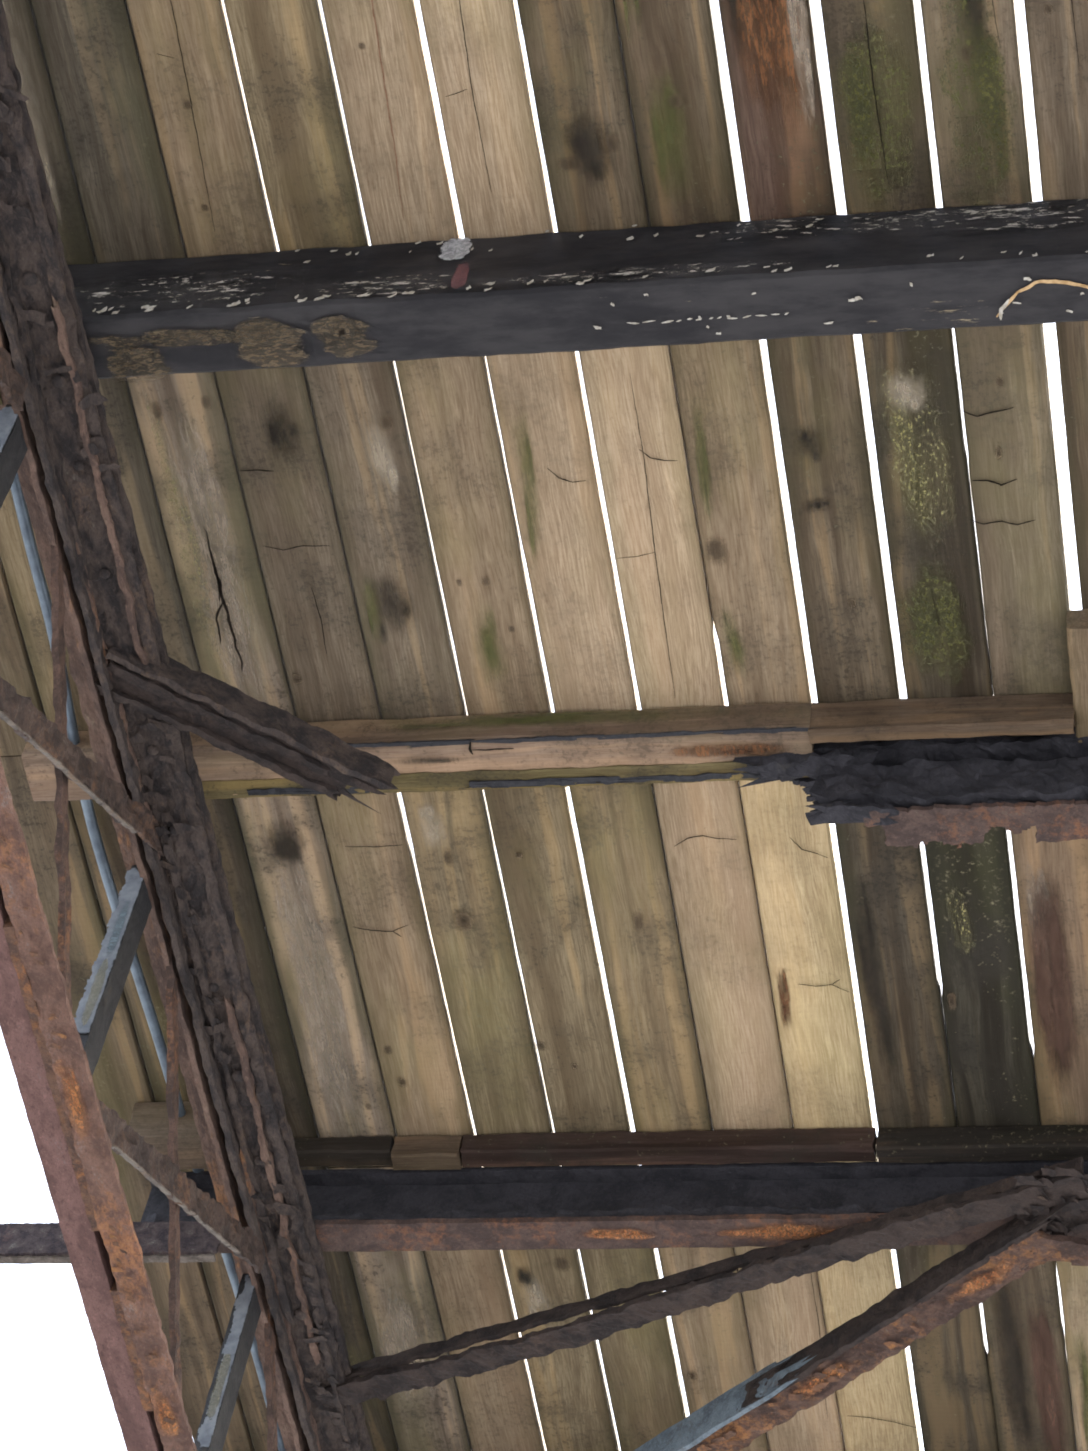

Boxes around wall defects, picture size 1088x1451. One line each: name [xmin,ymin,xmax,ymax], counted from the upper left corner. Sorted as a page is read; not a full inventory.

corrosion [732,0,807,113]
crack [203,526,243,671]
corrosion [59,1061,85,1133]
corrosion [591,1229,651,1239]
corrosion [723,1225,833,1239]
corrosion [959,1265,1007,1295]
corrosion [155,1400,178,1434]